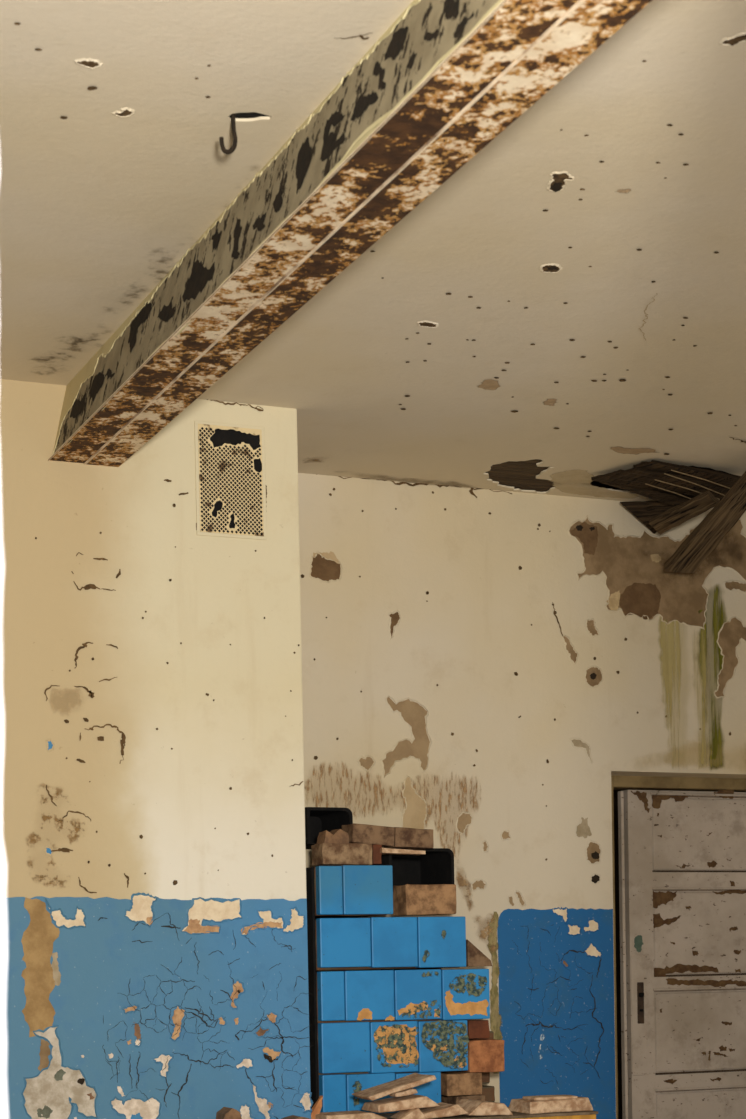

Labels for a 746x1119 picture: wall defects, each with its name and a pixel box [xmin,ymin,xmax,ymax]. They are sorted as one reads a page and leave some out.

corrosion [51,0,652,467]
flaking render [301,551,343,583]
flaking render [568,512,746,629]
water stain [660,617,681,723]
flaking render [713,616,746,699]
peeling [357,696,432,829]
peeling [124,892,159,928]
peeling [181,897,306,937]
spalling [551,907,603,958]
crack [102,913,311,1119]
crack [512,925,604,1084]
spalling [238,1083,274,1119]